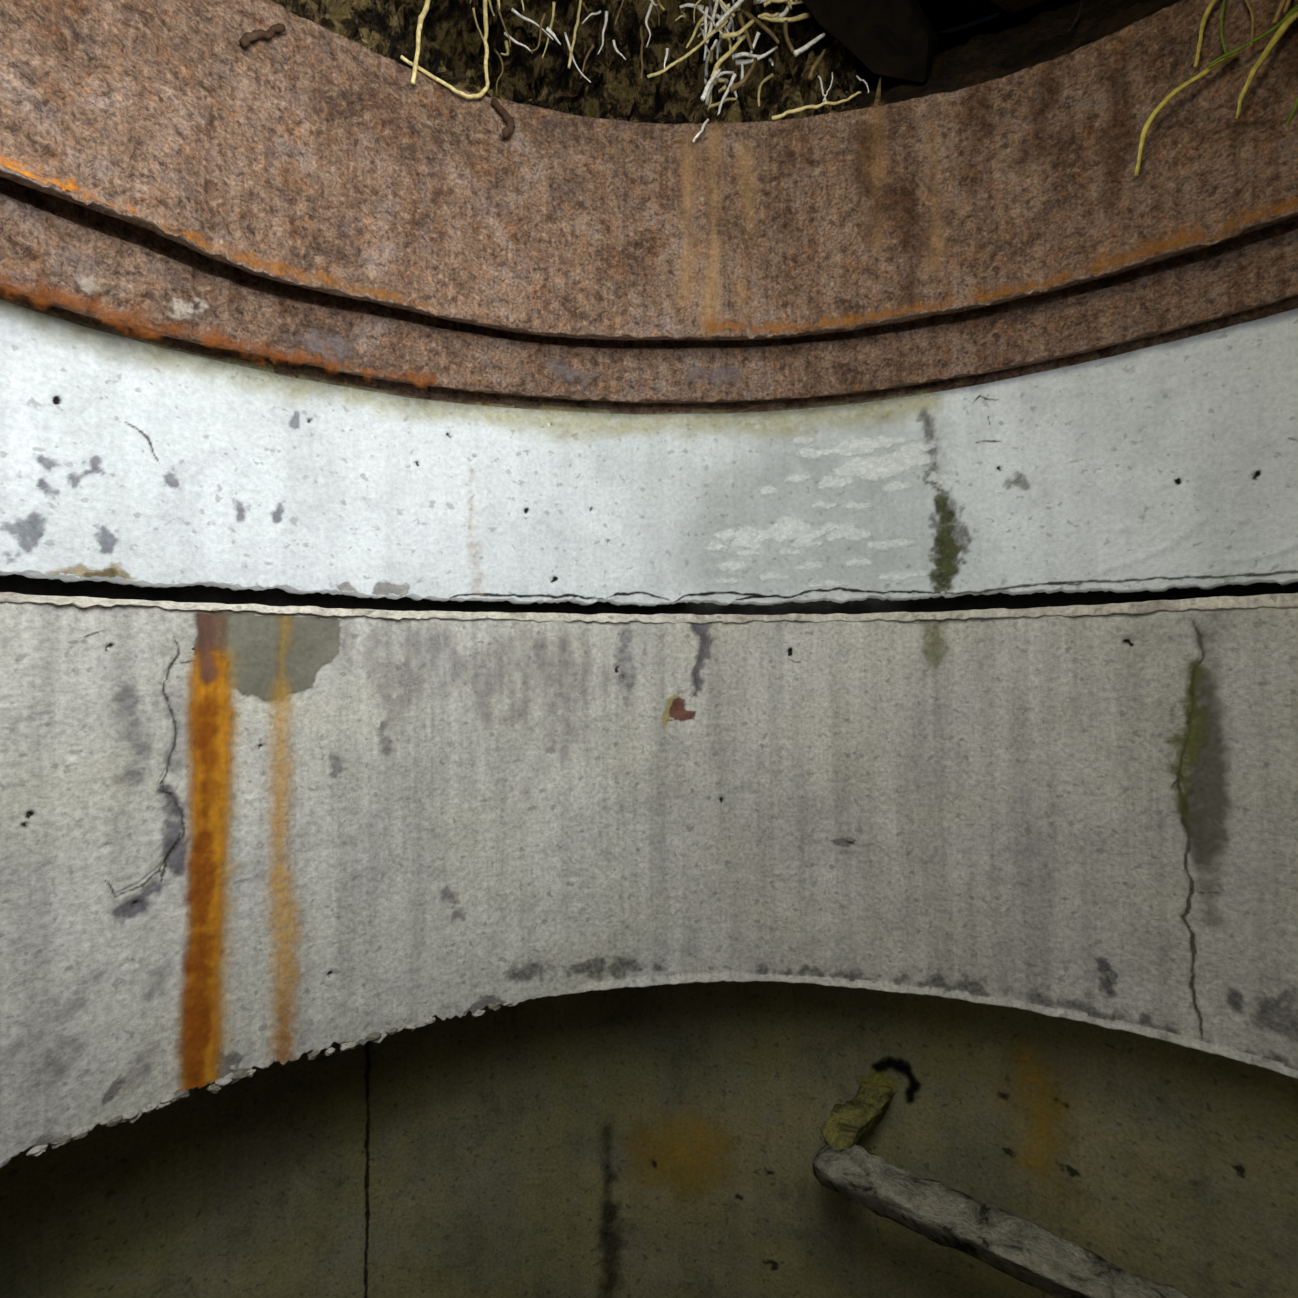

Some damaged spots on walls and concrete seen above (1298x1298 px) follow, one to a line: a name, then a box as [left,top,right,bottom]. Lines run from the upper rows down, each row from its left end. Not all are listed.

rust [0,158,115,208]
rust [0,276,184,337]
rust [200,330,347,387]
rust [362,369,436,384]
water stain [921,412,936,474]
water stain [931,491,971,579]
water stain [195,612,340,701]
crack [105,642,190,918]
rust [182,613,232,1090]
rust [271,687,297,1063]
crack [1168,623,1226,1035]